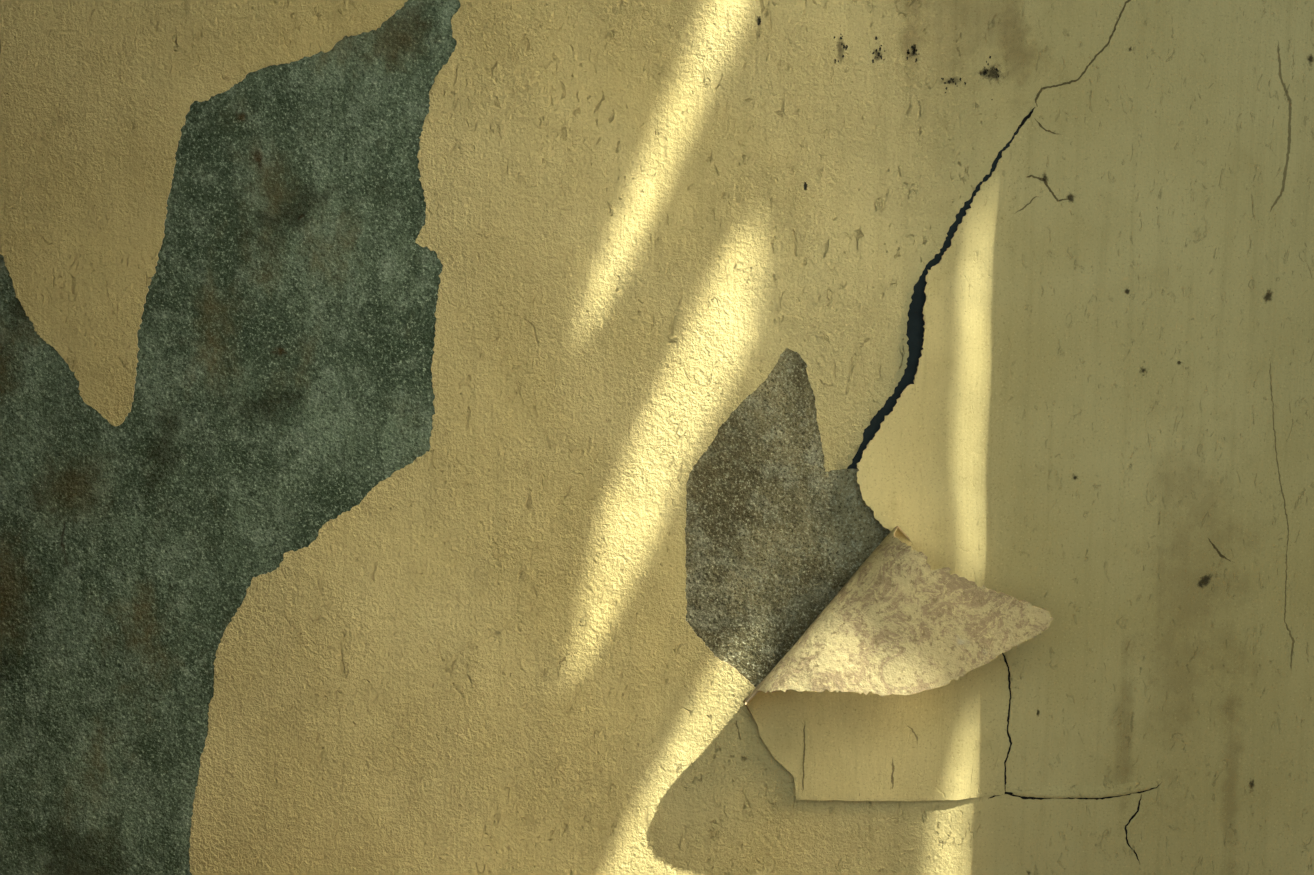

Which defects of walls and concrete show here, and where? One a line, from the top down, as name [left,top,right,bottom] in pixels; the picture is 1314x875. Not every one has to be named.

peeling [0,0,461,875]
peeling [685,113,1054,801]
crack [847,0,1131,469]
crack [990,647,1162,864]